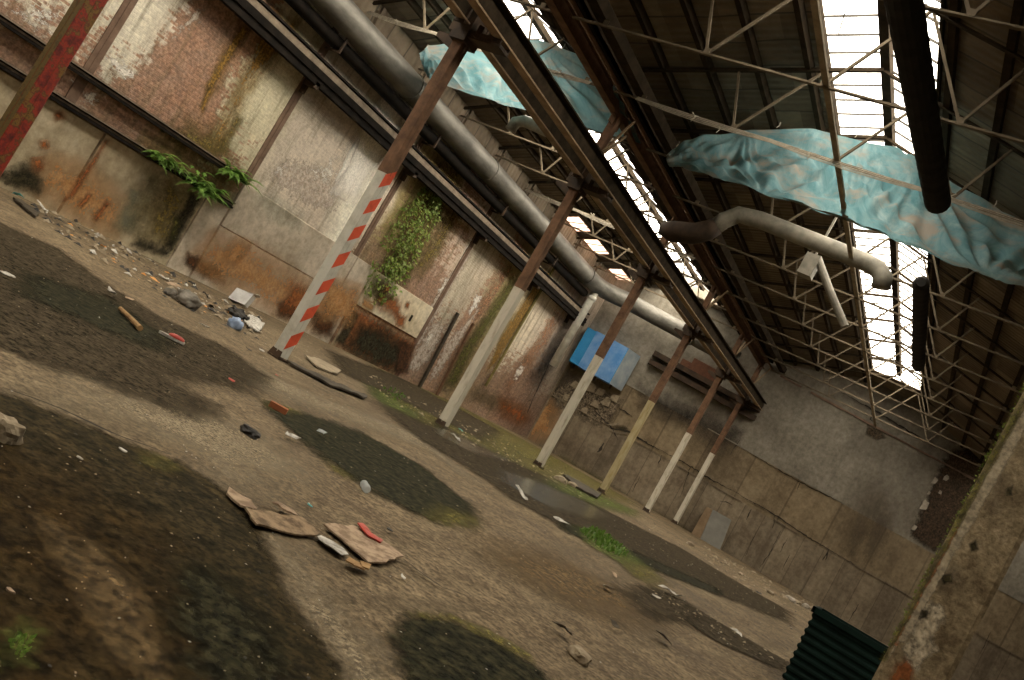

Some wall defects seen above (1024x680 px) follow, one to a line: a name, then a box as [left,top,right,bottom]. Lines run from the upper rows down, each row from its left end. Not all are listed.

peeling [105,52,136,80]
damp [175,25,278,155]
damp [0,164,42,194]
rust [32,140,118,226]
rust [202,244,307,311]
rust [312,284,410,327]
peeling [408,239,482,380]
damp [487,287,540,370]
damp [0,217,483,527]
spalling [552,379,627,434]
crack [592,408,855,570]